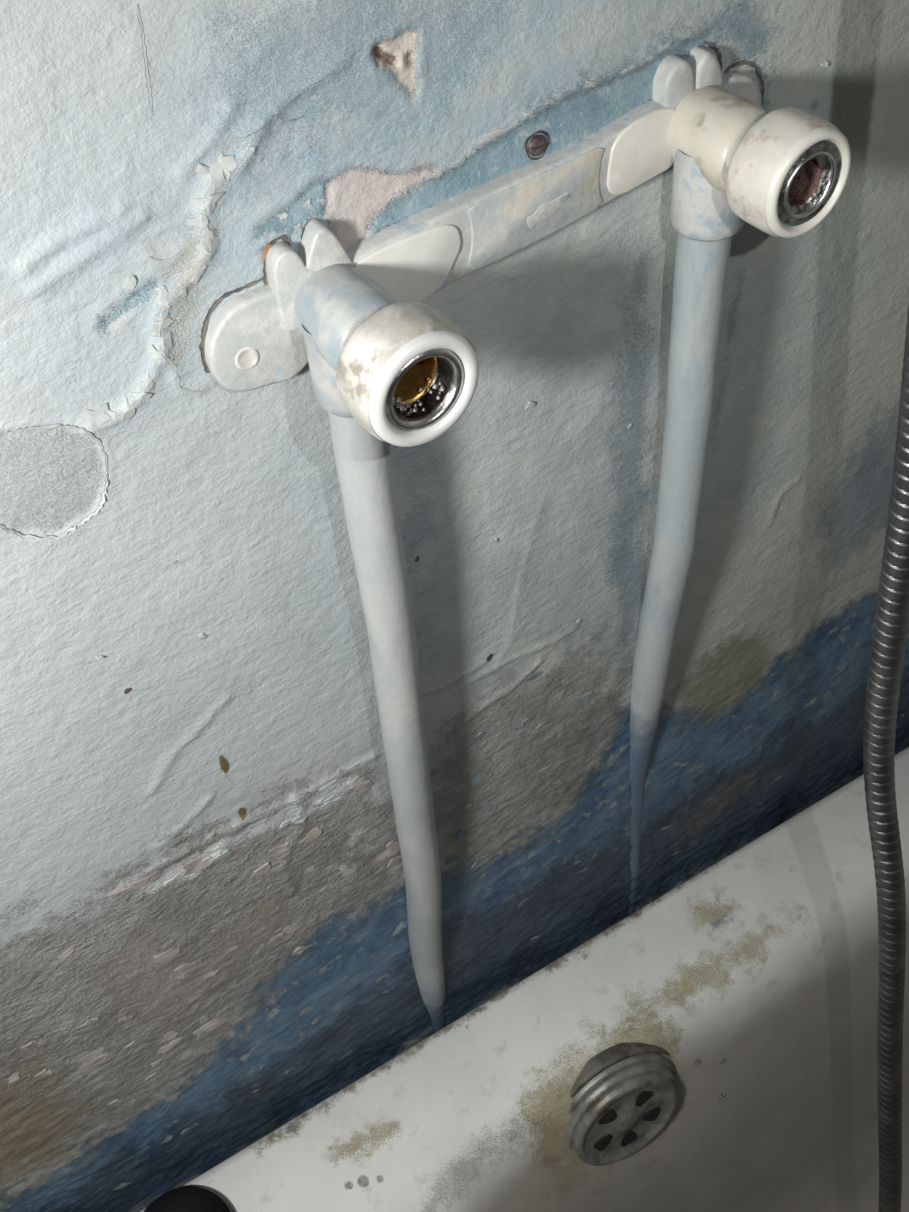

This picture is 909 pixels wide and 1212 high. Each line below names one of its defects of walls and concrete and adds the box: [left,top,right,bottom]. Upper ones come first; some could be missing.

peeling [255,0,783,250]
water stain [894,660,909,754]
water stain [21,677,867,1212]